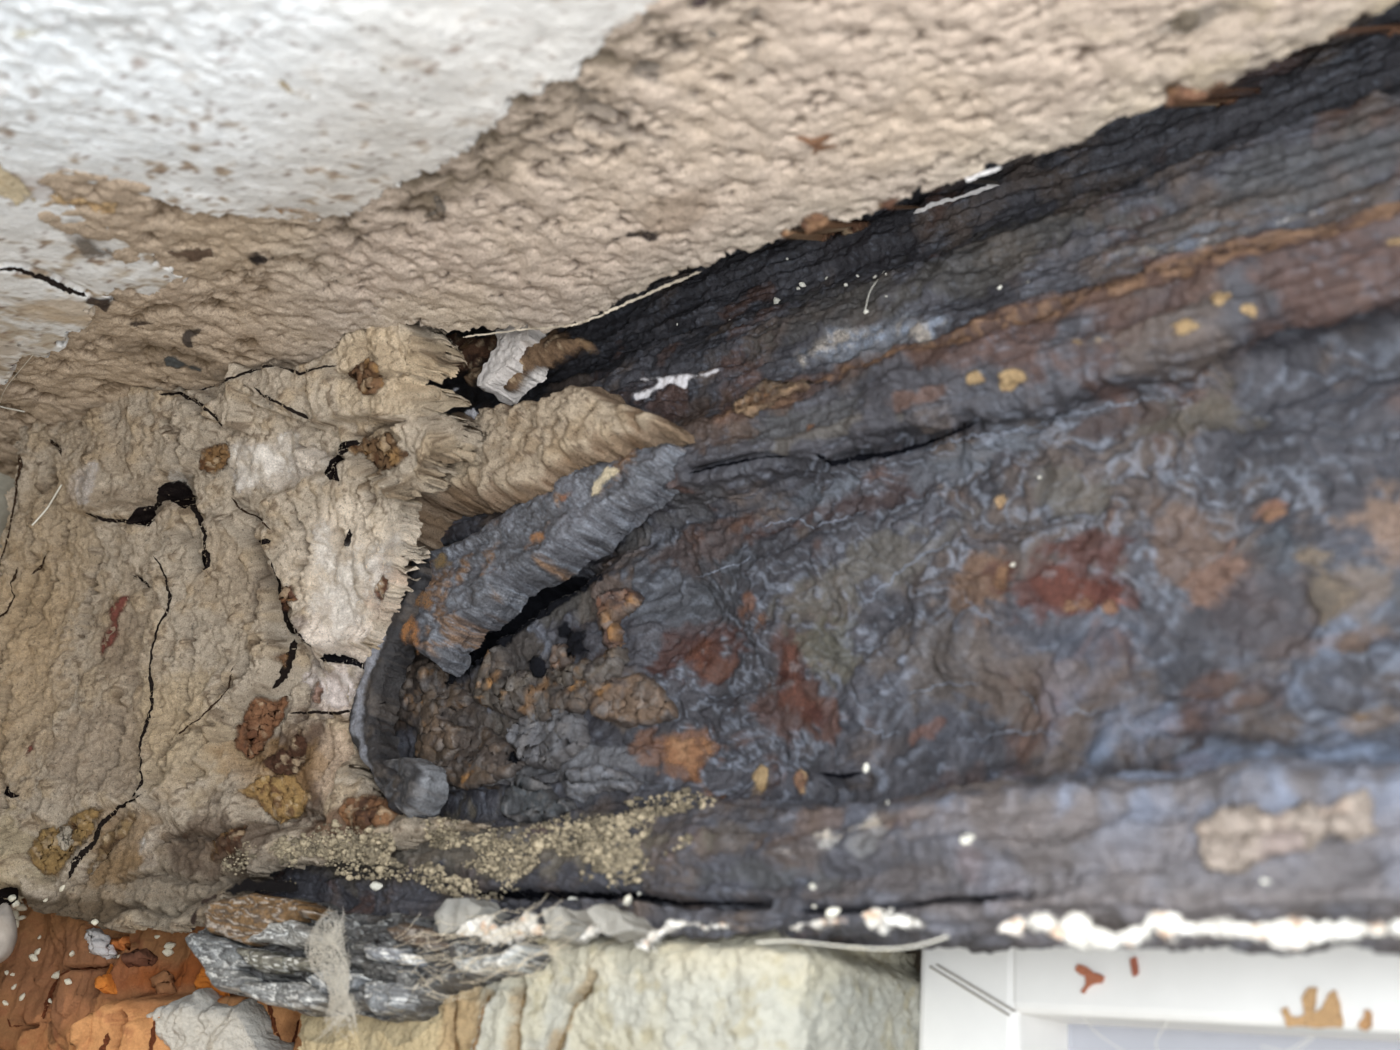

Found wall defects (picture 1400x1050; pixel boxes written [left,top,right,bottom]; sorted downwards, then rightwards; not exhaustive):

crack [0,267,87,297]
spalling [0,0,1398,479]
corrosion [780,213,869,242]
crack [160,364,337,428]
corrosion [966,369,1027,392]
crack [84,480,209,566]
flaking render [0,321,492,934]
crack [232,498,364,715]
spalling [444,571,608,687]
crack [68,556,233,879]
corrosion [338,794,399,830]
corrosion [1194,788,1382,874]